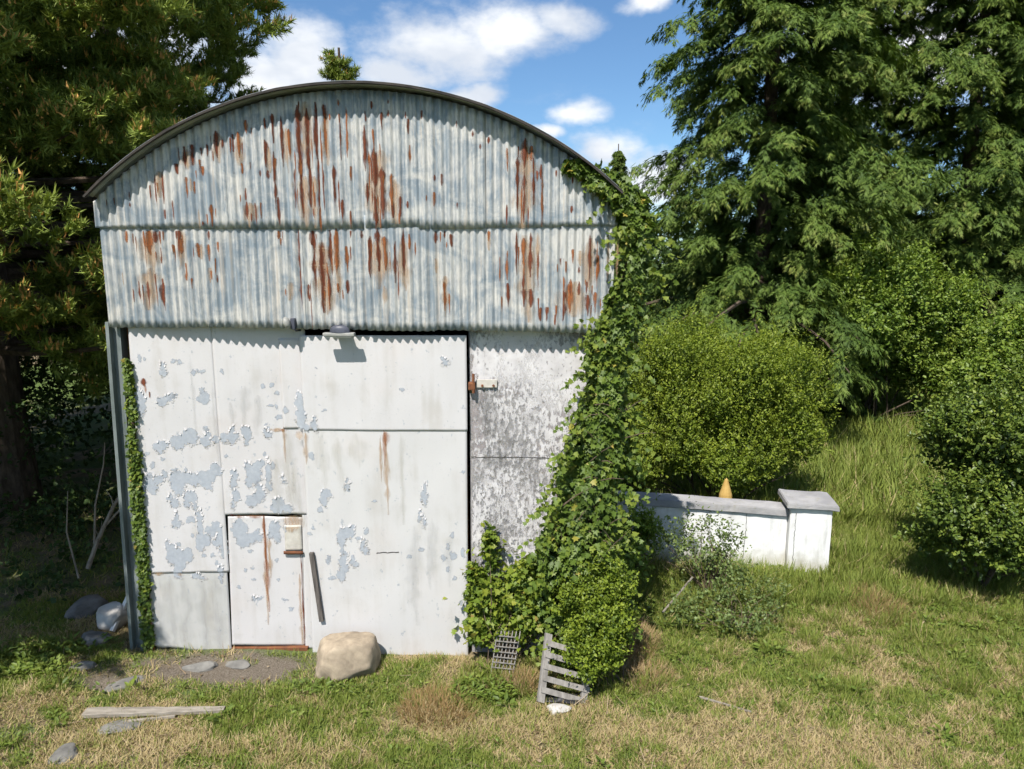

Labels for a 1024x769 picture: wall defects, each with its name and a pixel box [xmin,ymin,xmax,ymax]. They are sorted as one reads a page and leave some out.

corrosion [122,172,219,309]
corrosion [175,100,416,329]
corrosion [499,138,618,325]
peeling [134,386,178,418]
peeling [142,383,327,584]
peeling [317,476,352,513]
peeling [418,481,429,530]
corrosion [252,515,271,606]
peeling [326,523,370,583]